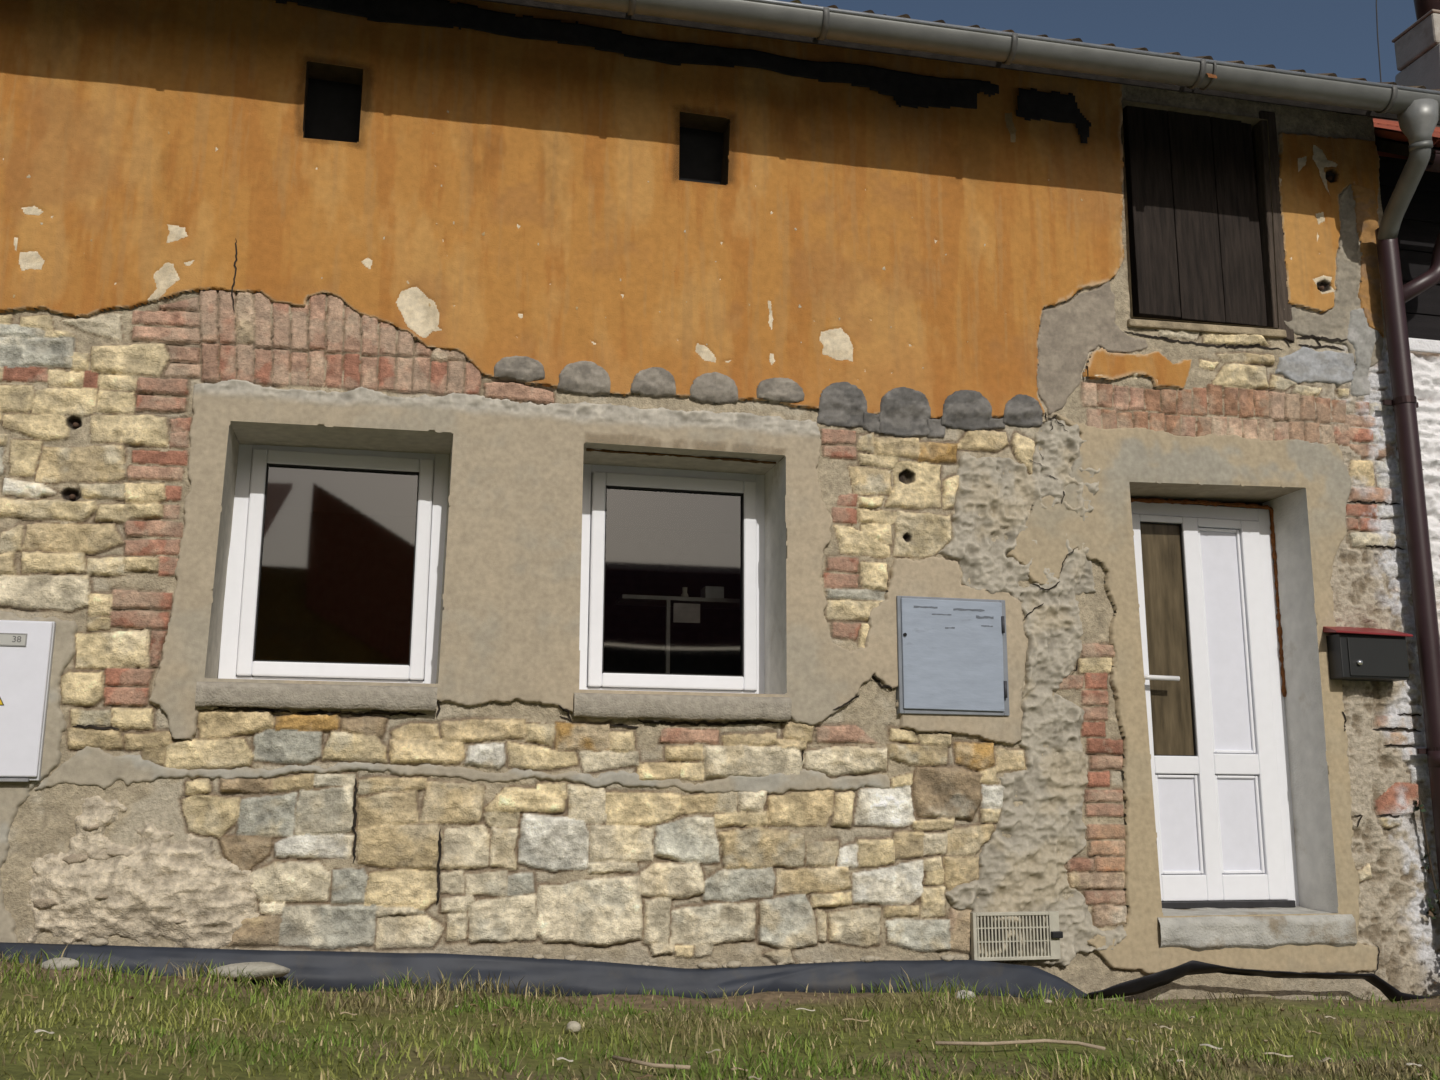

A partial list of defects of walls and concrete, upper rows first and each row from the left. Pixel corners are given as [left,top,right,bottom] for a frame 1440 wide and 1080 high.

peeling [1298,145,1337,192]
peeling [14,237,45,271]
crack [230,238,238,311]
peeling [1313,275,1335,294]
peeling [814,318,853,370]